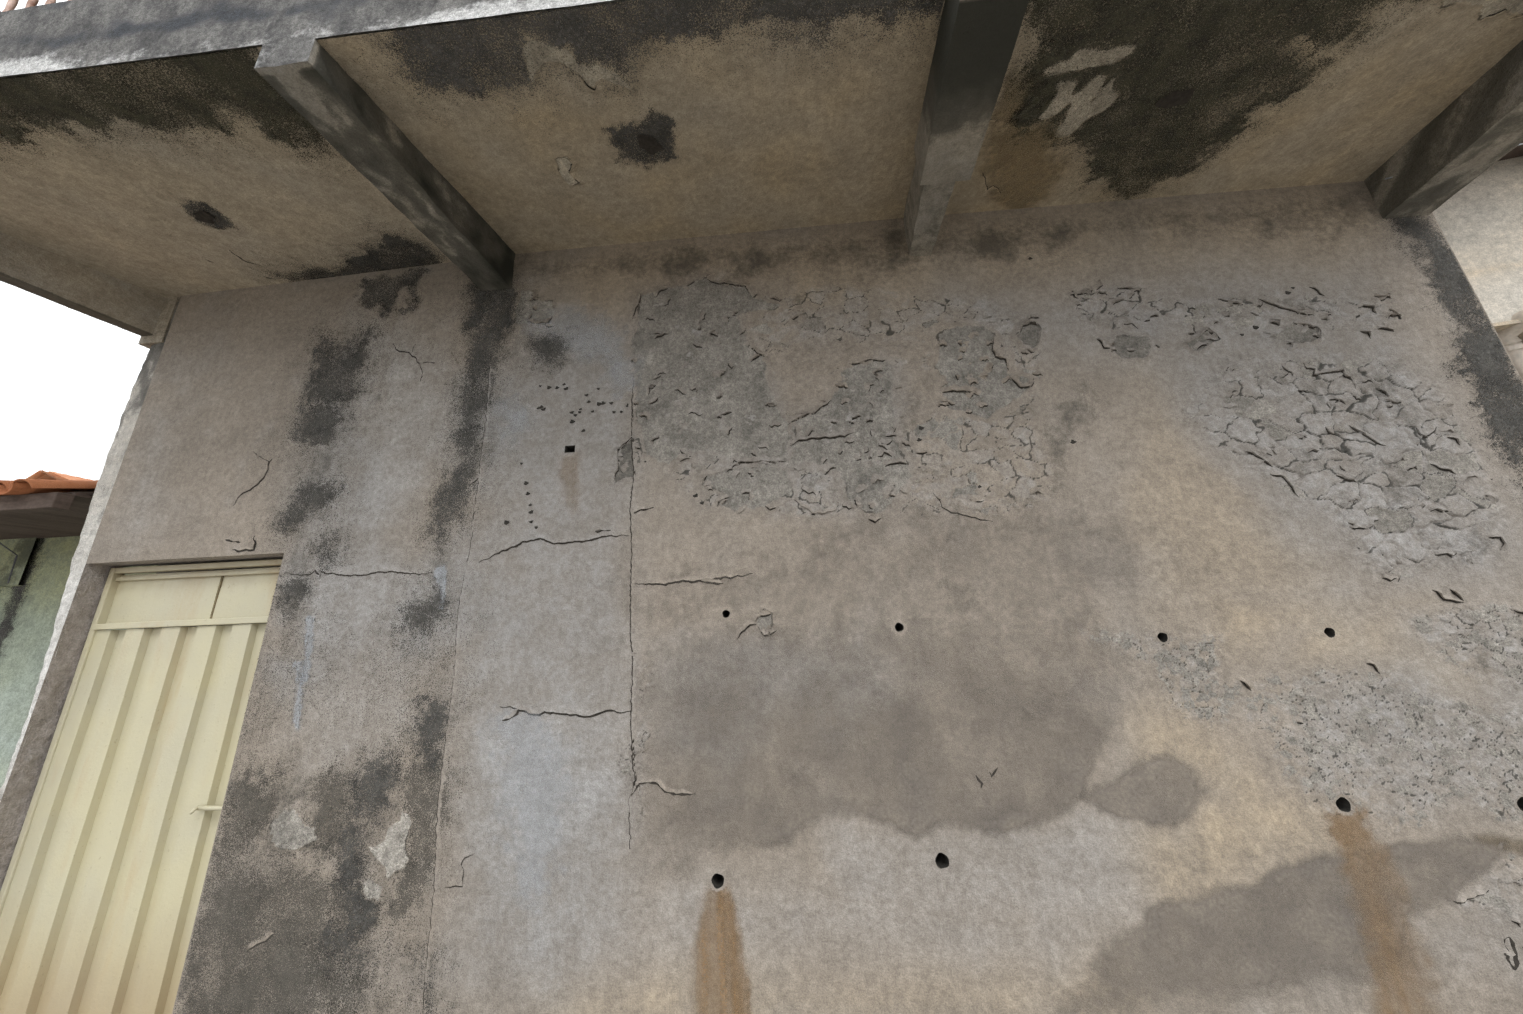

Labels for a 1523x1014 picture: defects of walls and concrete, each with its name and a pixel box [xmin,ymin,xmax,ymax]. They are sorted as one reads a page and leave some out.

water stain [0,47,357,185]
water stain [334,0,944,169]
water stain [984,0,1448,205]
water stain [241,211,451,449]
crack [225,451,272,552]
water stain [265,468,350,728]
water stain [173,686,468,1014]
water stain [394,270,578,654]
crack [285,342,753,1014]
water stain [686,672,1200,844]
peeling [1063,279,1523,970]